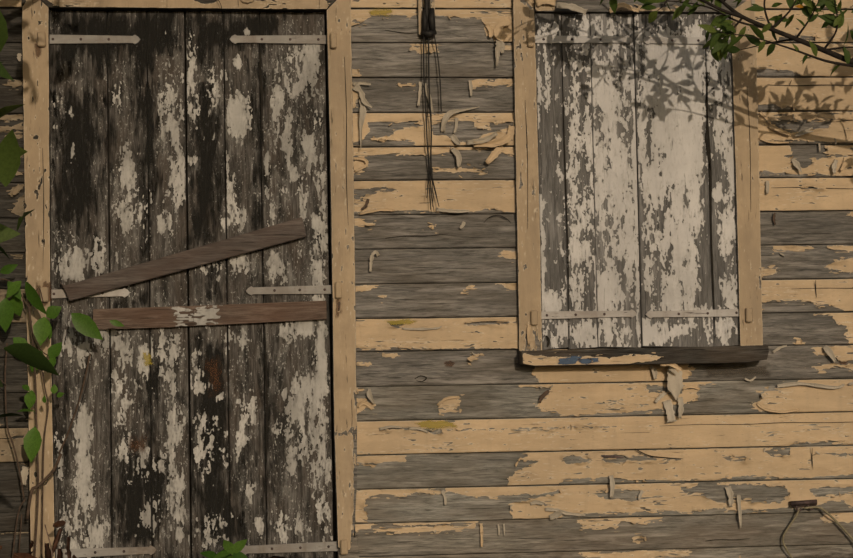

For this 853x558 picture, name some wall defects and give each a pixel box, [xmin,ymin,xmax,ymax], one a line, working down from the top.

peeling [194,0,275,9]
peeling [51,31,253,282]
peeling [263,151,276,227]
peeling [266,44,328,286]
peeling [351,0,853,435]
peeling [54,294,853,558]